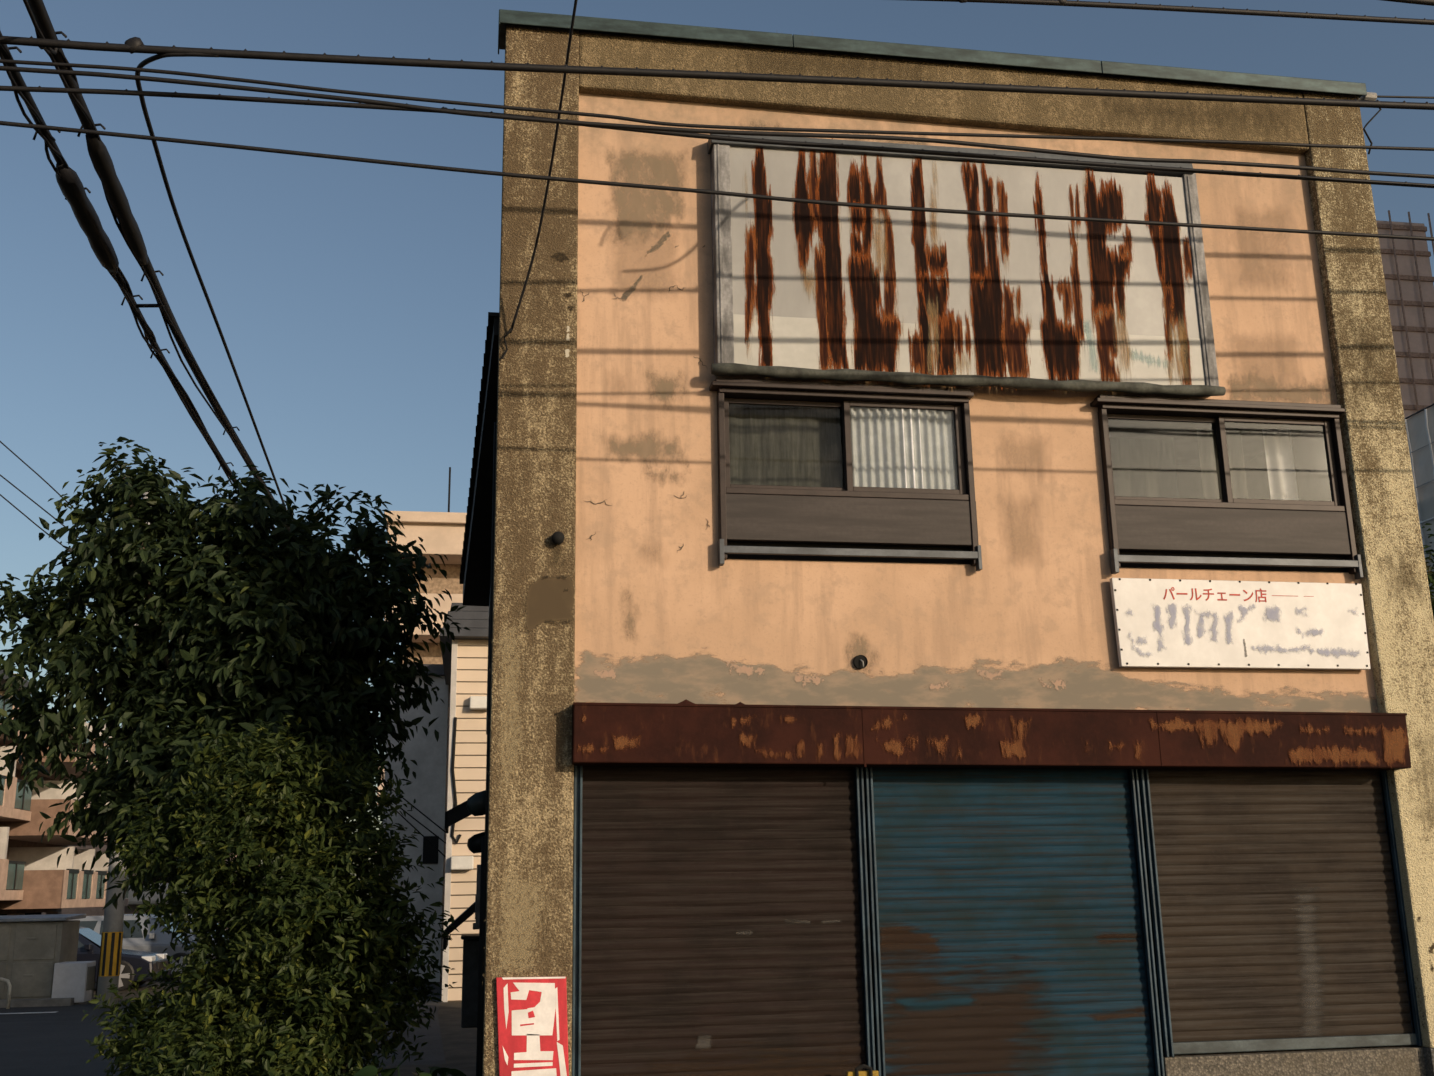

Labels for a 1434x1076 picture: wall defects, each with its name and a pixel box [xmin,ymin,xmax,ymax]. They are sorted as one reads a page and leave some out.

water stain [609,154,683,239]
rust [744,148,775,366]
rust [793,138,1193,391]
peeling [574,650,1408,767]
rust [861,923,1051,1076]